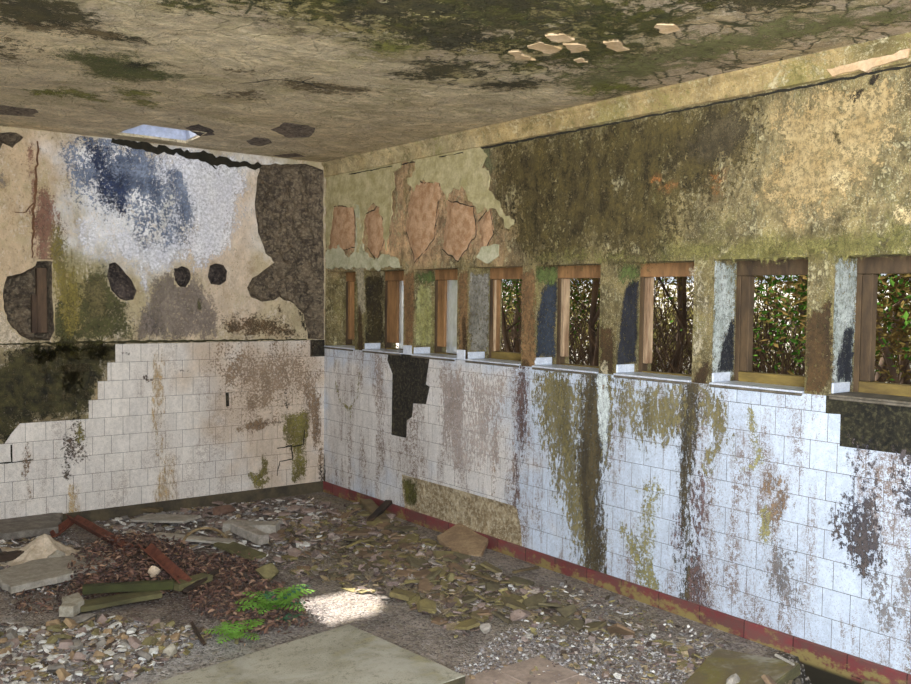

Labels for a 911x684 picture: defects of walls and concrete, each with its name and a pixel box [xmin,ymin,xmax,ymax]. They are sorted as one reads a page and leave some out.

peeling [508,32,589,63]
flaking render [0,132,23,148]
crack [345,161,415,175]
crack [439,64,911,157]
spalling [107,262,136,301]
leakage [60,136,325,433]
flaking render [247,147,515,357]
peeling [0,261,130,444]
peeling [387,354,430,438]
leakage [432,70,911,608]
peeling [826,396,911,455]
leakage [828,437,911,637]